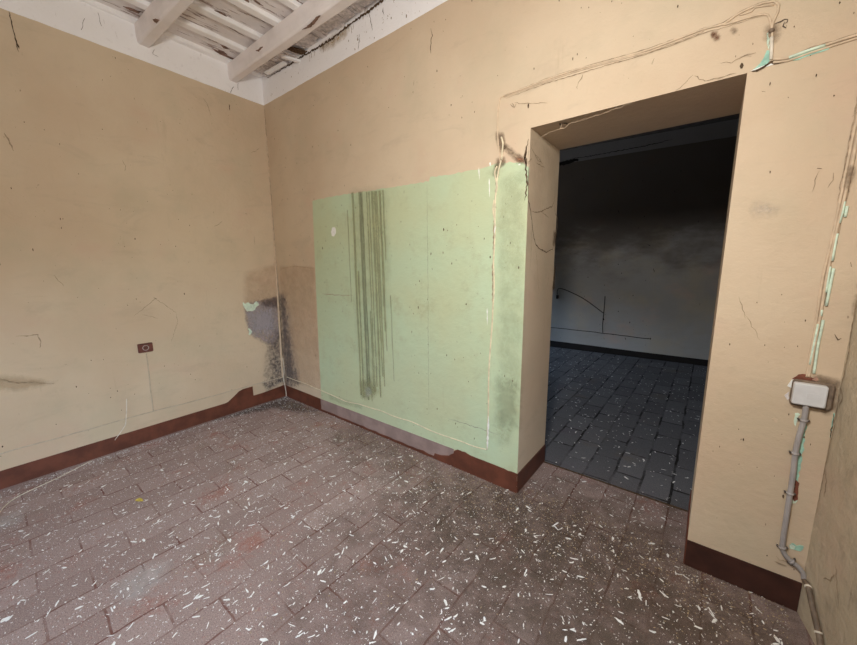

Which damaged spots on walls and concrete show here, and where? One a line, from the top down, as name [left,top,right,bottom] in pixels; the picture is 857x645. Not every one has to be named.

spalling [254,0,375,76]
crack [503,103,631,257]
peeling [243,301,259,311]
peeling [203,399,434,545]
peeling [501,467,587,577]